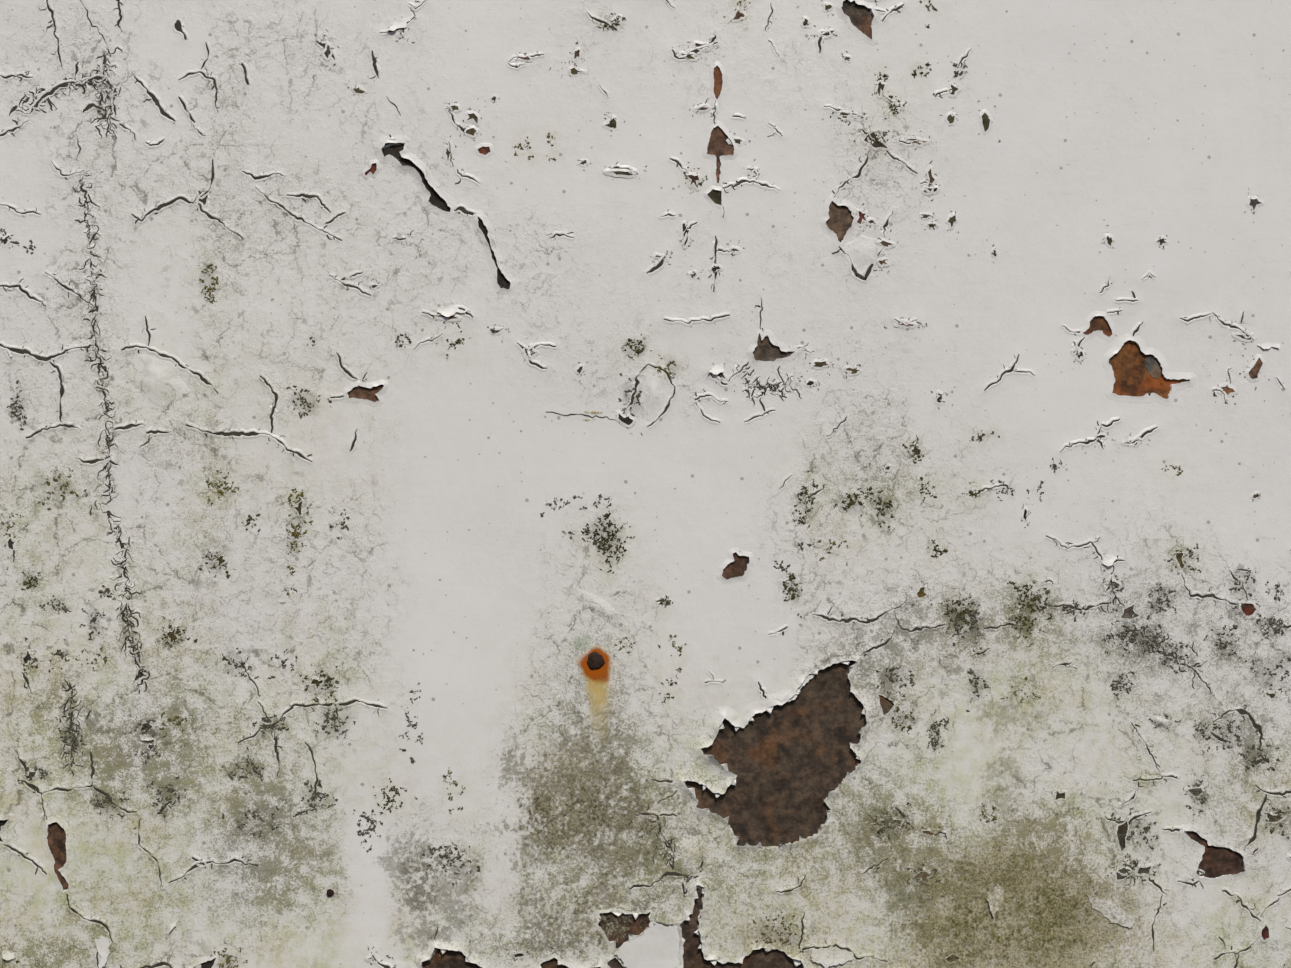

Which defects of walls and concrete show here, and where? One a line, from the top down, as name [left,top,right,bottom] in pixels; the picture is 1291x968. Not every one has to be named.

peeling [676,40,751,209]
crack [0,0,346,695]
leakage [540,494,635,573]
crack [12,671,259,891]
leakage [268,649,356,738]
leakage [353,772,417,852]
corrosion [580,648,610,699]
peeling [671,648,899,859]
crack [971,533,1291,858]
leakage [1099,568,1291,692]
peeling [1179,775,1250,884]
peeling [364,876,854,968]